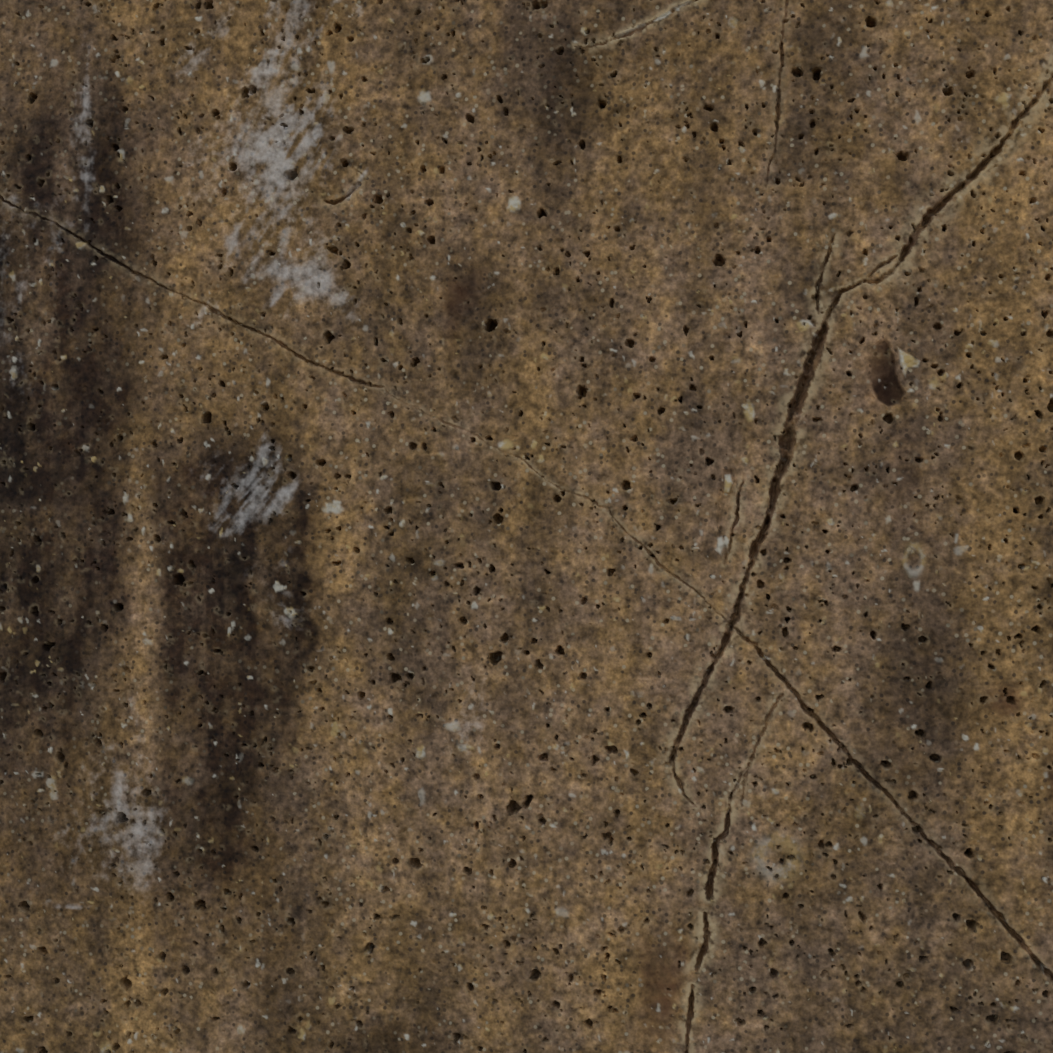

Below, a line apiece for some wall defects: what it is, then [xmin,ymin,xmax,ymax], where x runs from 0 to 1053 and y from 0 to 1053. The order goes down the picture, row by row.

crack [321,166,367,208]
crack [572,0,708,51]
crack [762,0,791,191]
crack [0,193,728,624]
damp [0,0,497,1053]
crack [665,69,1053,984]
crack [682,981,697,1053]